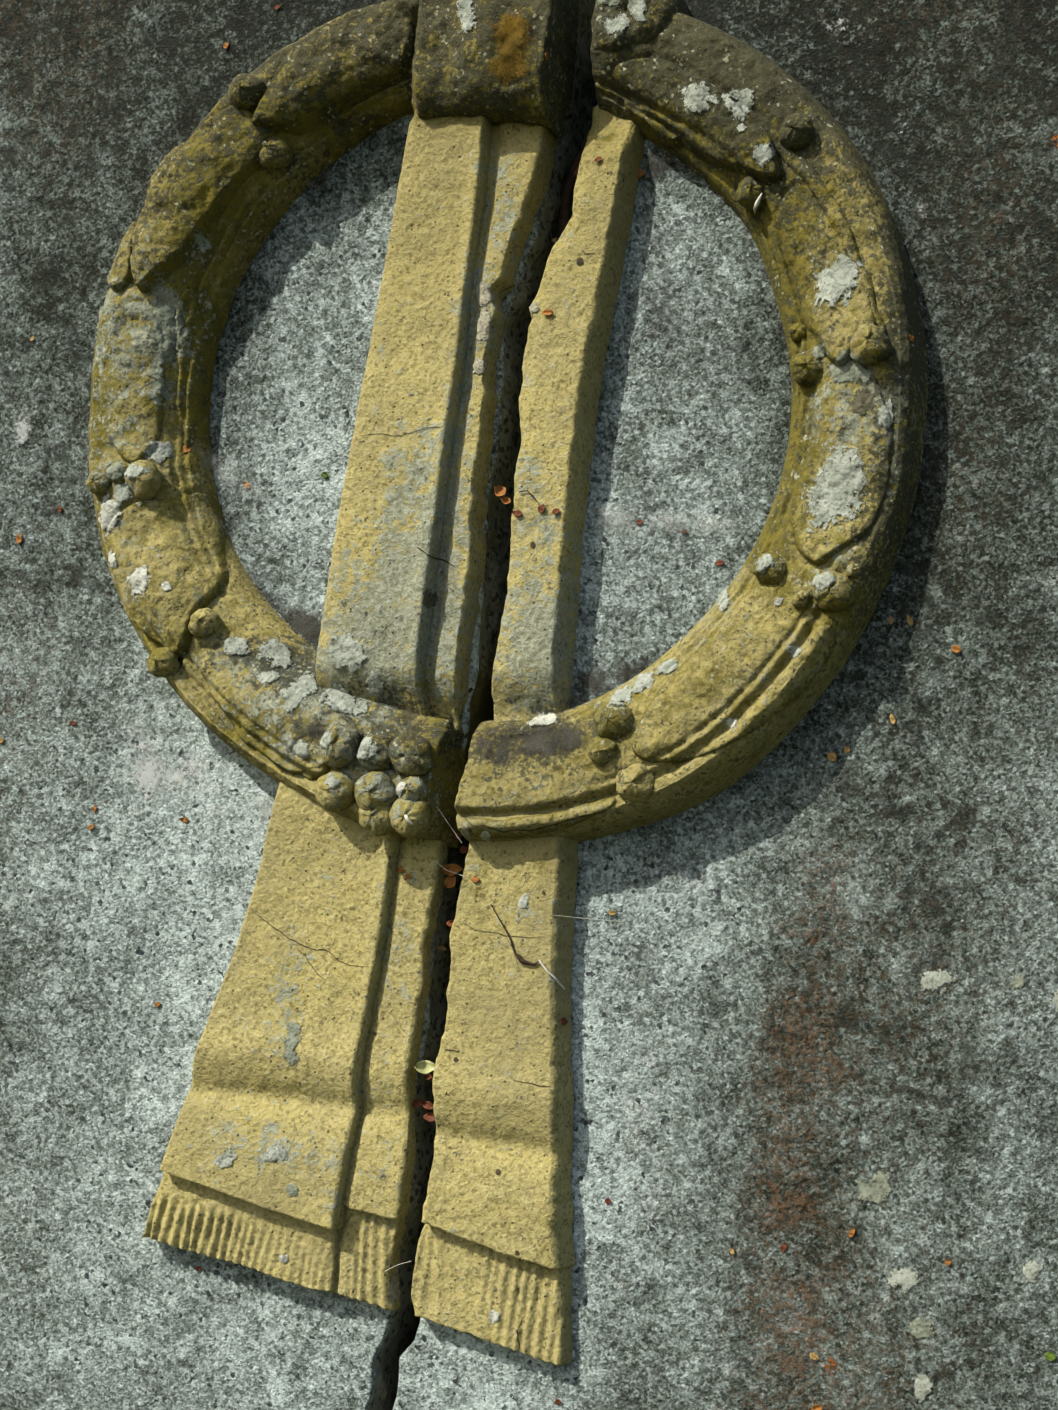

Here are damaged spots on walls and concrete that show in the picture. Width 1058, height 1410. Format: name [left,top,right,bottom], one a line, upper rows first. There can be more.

crack [359,426,443,436]
crack [417,0,598,770]
crack [369,810,606,1410]
rust [712,843,896,1410]